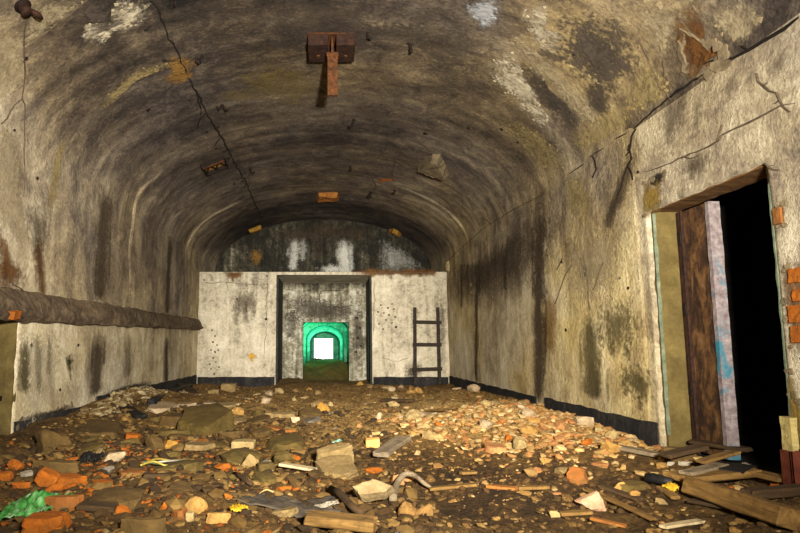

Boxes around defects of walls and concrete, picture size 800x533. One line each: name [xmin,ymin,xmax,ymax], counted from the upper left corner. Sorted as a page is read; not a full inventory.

crack [1,17,37,190]
crack [149,0,262,220]
leakage [541,13,640,111]
crack [569,17,798,196]
spalling [641,0,763,81]
rust [0,235,22,289]
rust [35,244,45,294]
leakage [94,197,112,298]
leakage [285,225,361,272]
leakage [454,202,555,400]
leakage [584,303,636,397]
leakage [621,364,650,401]